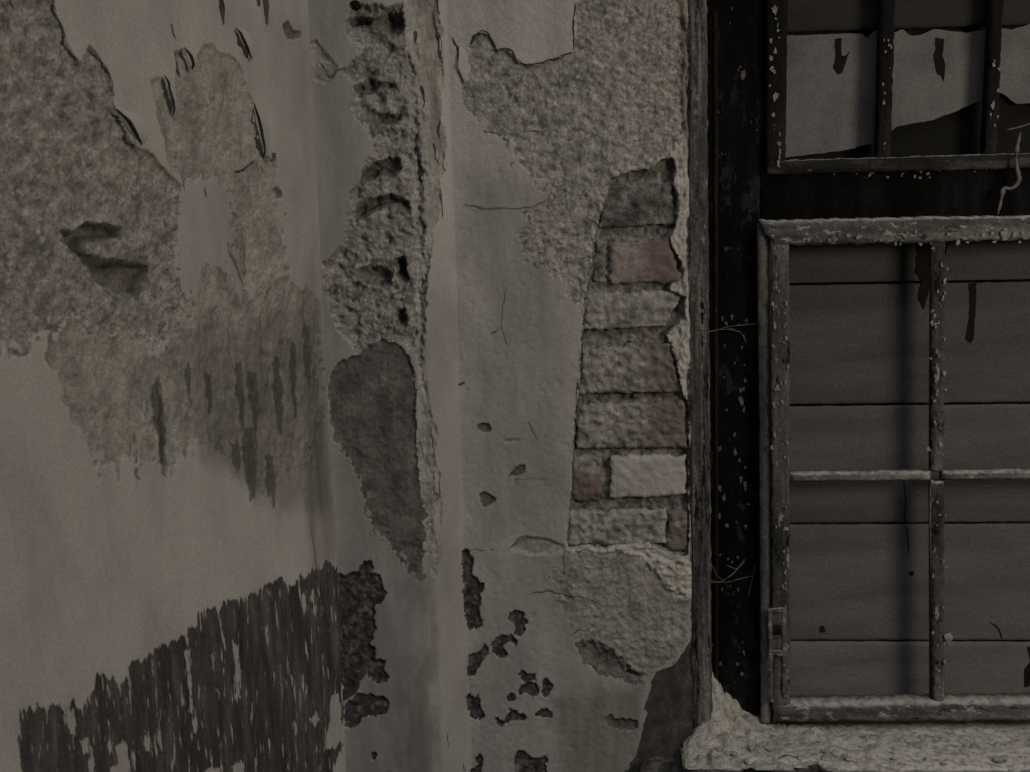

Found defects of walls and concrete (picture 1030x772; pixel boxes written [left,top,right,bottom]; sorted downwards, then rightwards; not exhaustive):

flaking render [0,0,447,577]
flaking render [457,0,691,556]
peeling [461,549,484,630]
peeling [17,560,390,772]
peeling [467,610,528,676]
peeling [465,670,554,727]
peeling [471,754,483,772]
peeling [514,750,548,772]